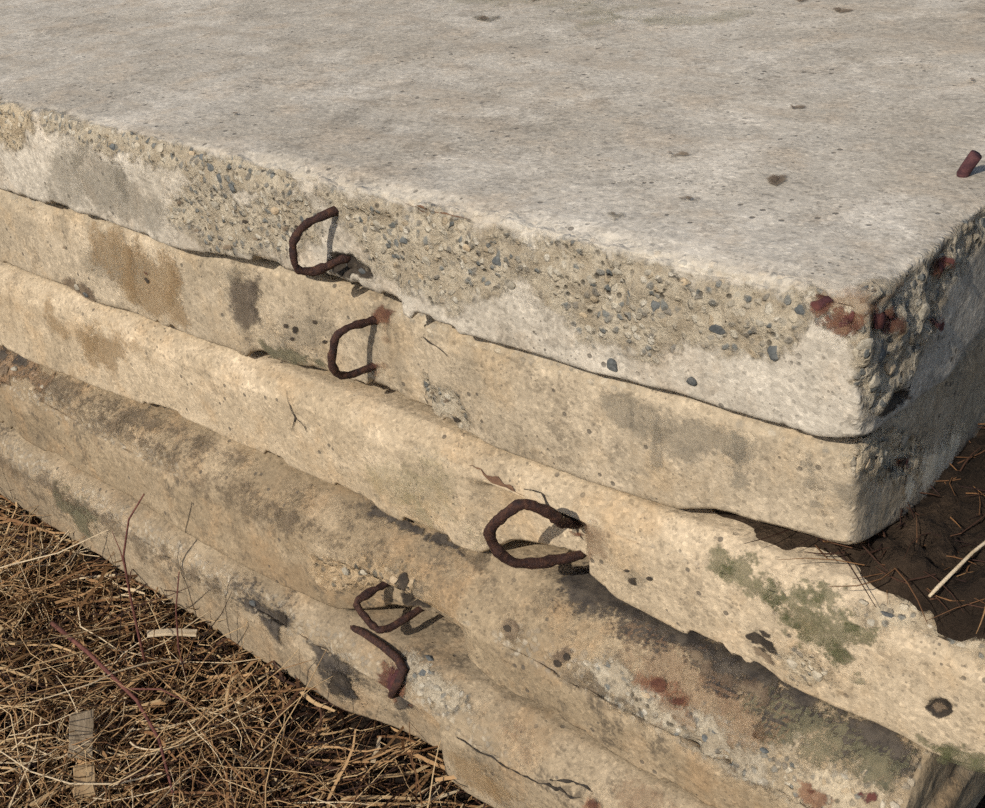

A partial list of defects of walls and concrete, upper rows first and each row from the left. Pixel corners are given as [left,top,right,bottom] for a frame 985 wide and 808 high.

corrosion [932,253,956,279]
corrosion [372,304,396,324]
spalling [313,186,985,419]
corrosion [810,294,907,337]
corrosion [378,658,412,710]
corrosion [634,673,688,709]